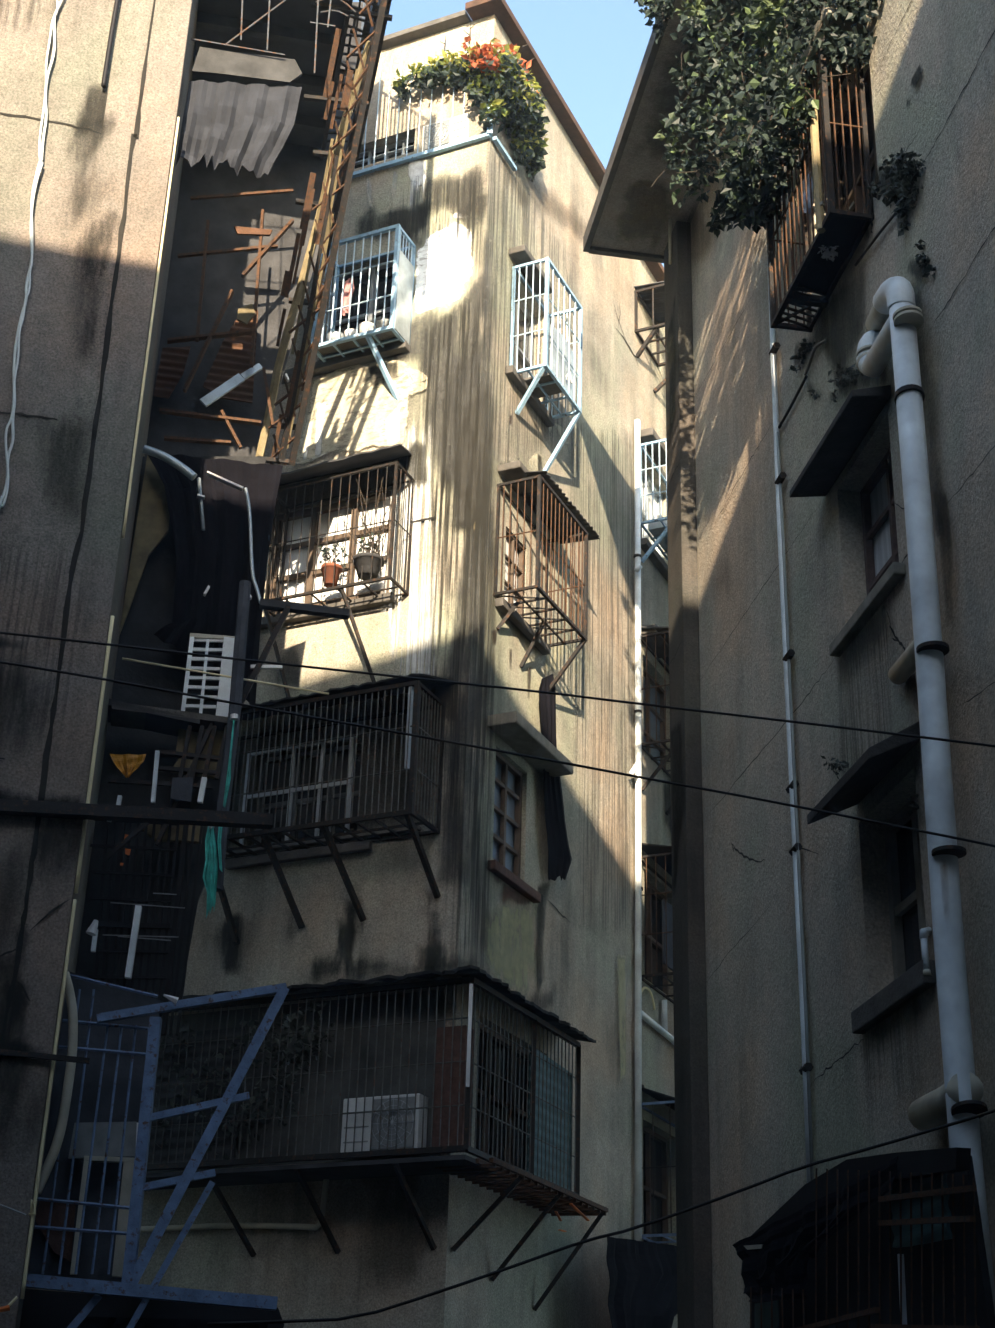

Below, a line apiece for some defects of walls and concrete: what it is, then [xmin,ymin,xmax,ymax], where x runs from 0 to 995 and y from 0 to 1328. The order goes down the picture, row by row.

crack [0,0,155,1001]
damp [305,404,324,453]
damp [359,161,564,972]
damp [0,931,35,1141]
damp [311,901,388,981]